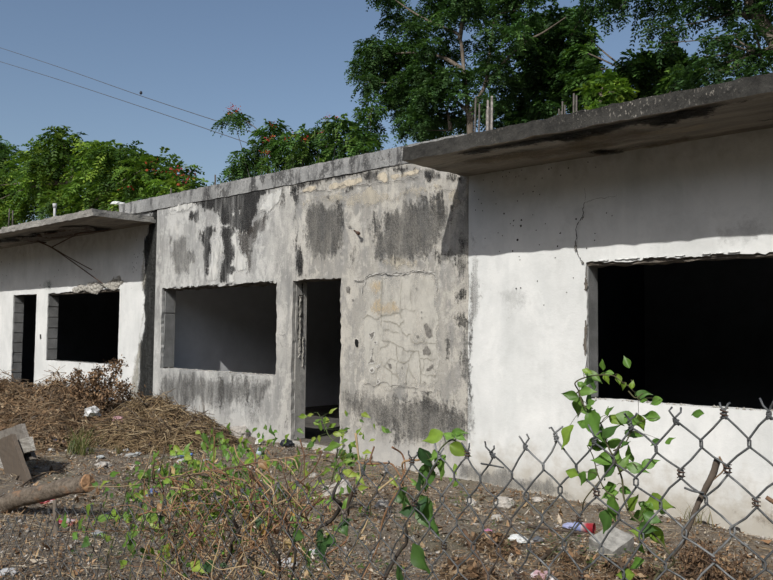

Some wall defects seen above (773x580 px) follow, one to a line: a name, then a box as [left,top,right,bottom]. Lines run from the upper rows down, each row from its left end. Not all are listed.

water stain [459,104,724,164]
water stain [280,174,345,205]
peeling [327,178,438,206]
peeling [378,169,419,183]
spalling [16,226,123,295]
water stain [170,189,270,283]
water stain [293,200,344,276]
water stain [367,192,464,272]
water stain [131,210,267,406]
crack [354,270,440,393]
water stain [454,282,474,348]
water stain [343,392,468,444]